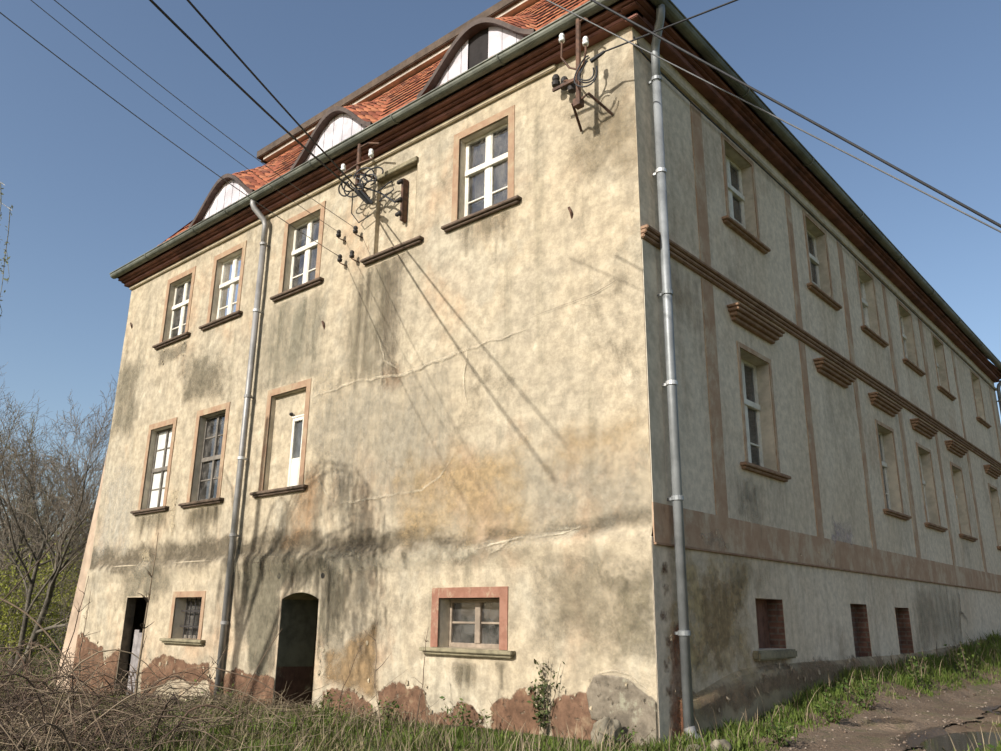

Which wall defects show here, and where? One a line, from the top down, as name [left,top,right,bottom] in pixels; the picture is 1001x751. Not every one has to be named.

water stain [114,369,137,430]
water stain [182,358,220,400]
water stain [269,298,317,373]
water stain [352,258,398,379]
crack [315,331,518,396]
water stain [542,477,650,535]
water stain [90,404,510,680]
crack [487,537,519,554]
water stain [686,560,748,674]
peeling [69,632,119,699]
peeling [140,654,274,707]
flaking render [317,626,597,740]